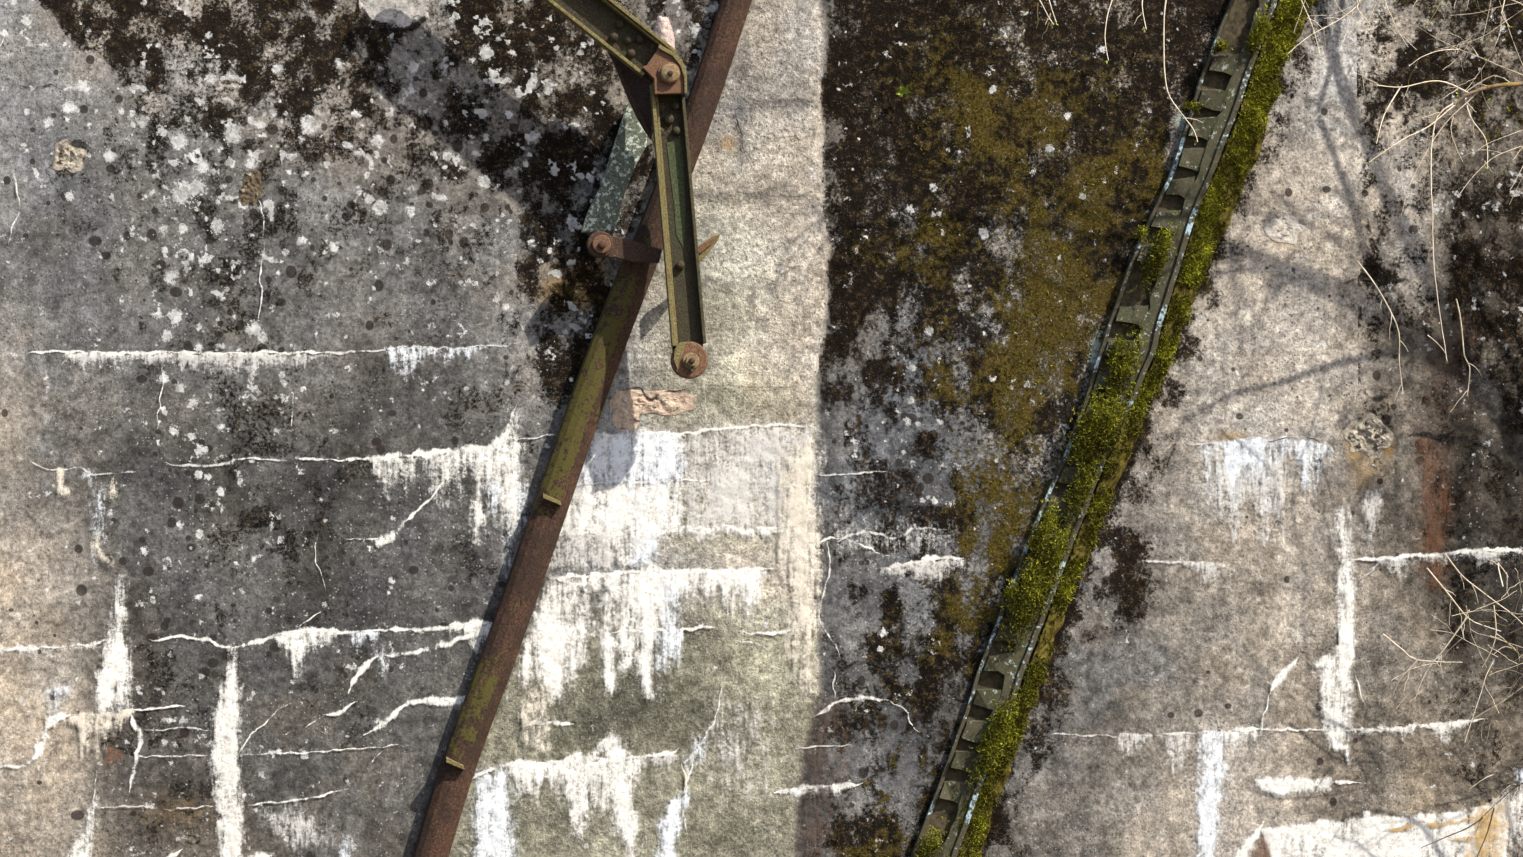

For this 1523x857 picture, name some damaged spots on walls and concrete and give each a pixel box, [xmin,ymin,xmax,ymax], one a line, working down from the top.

crack [157,355,165,429]
water stain [29,345,506,384]
crack [1408,430,1456,440]
crack [821,469,886,477]
crack [315,479,446,586]
water stain [471,422,823,857]
crack [797,528,936,749]
crack [1261,656,1299,731]
crack [138,701,407,805]
crack [94,804,213,812]